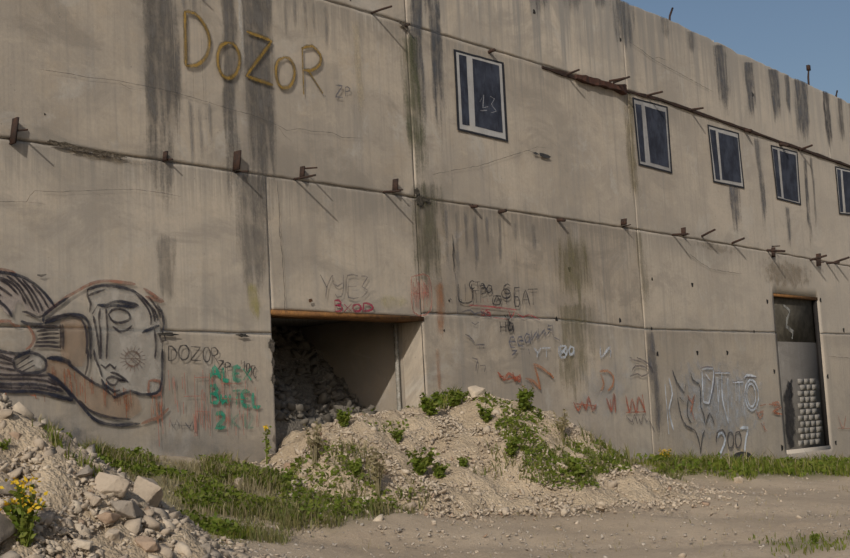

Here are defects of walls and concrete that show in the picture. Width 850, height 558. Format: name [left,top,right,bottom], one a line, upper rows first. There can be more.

water stain [145,0,180,149]
water stain [223,0,274,191]
water stain [411,0,442,114]
water stain [715,45,727,103]
water stain [745,62,756,111]
water stain [768,69,808,132]
water stain [823,91,843,144]